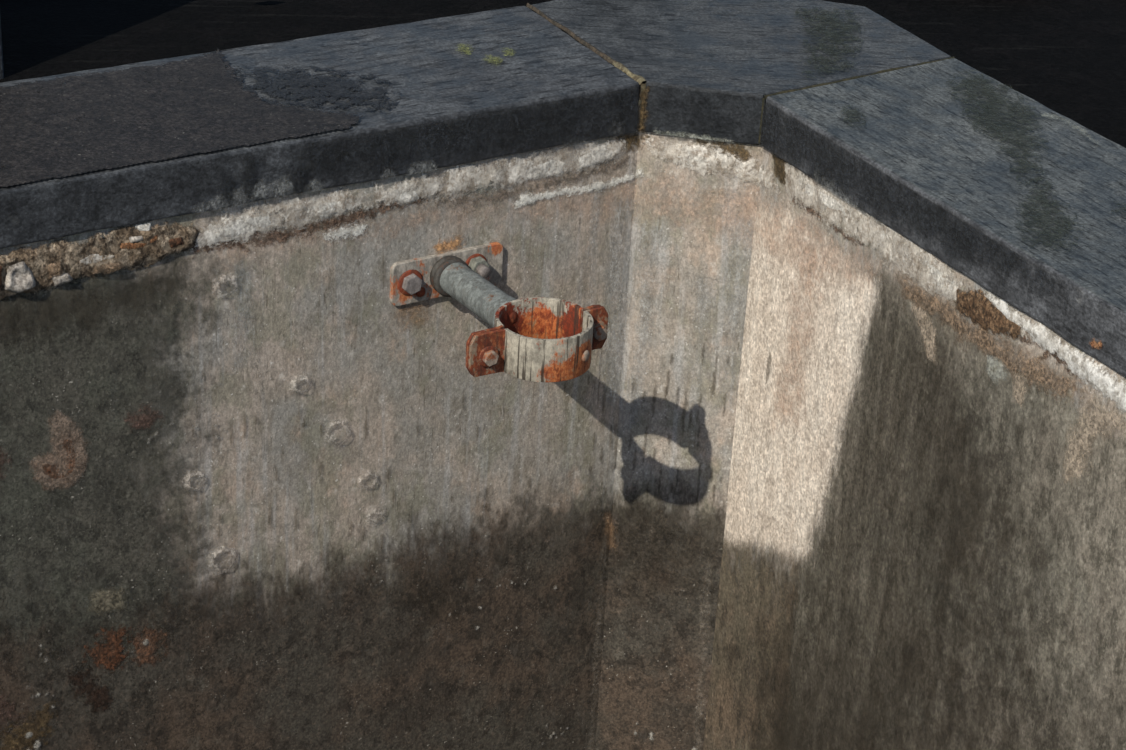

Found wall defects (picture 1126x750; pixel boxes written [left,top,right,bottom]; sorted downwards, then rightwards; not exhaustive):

leakage [0,49,643,212]
peeling [0,140,626,299]
peeling [646,133,1126,481]
rust [32,411,87,490]
rust [67,625,168,712]